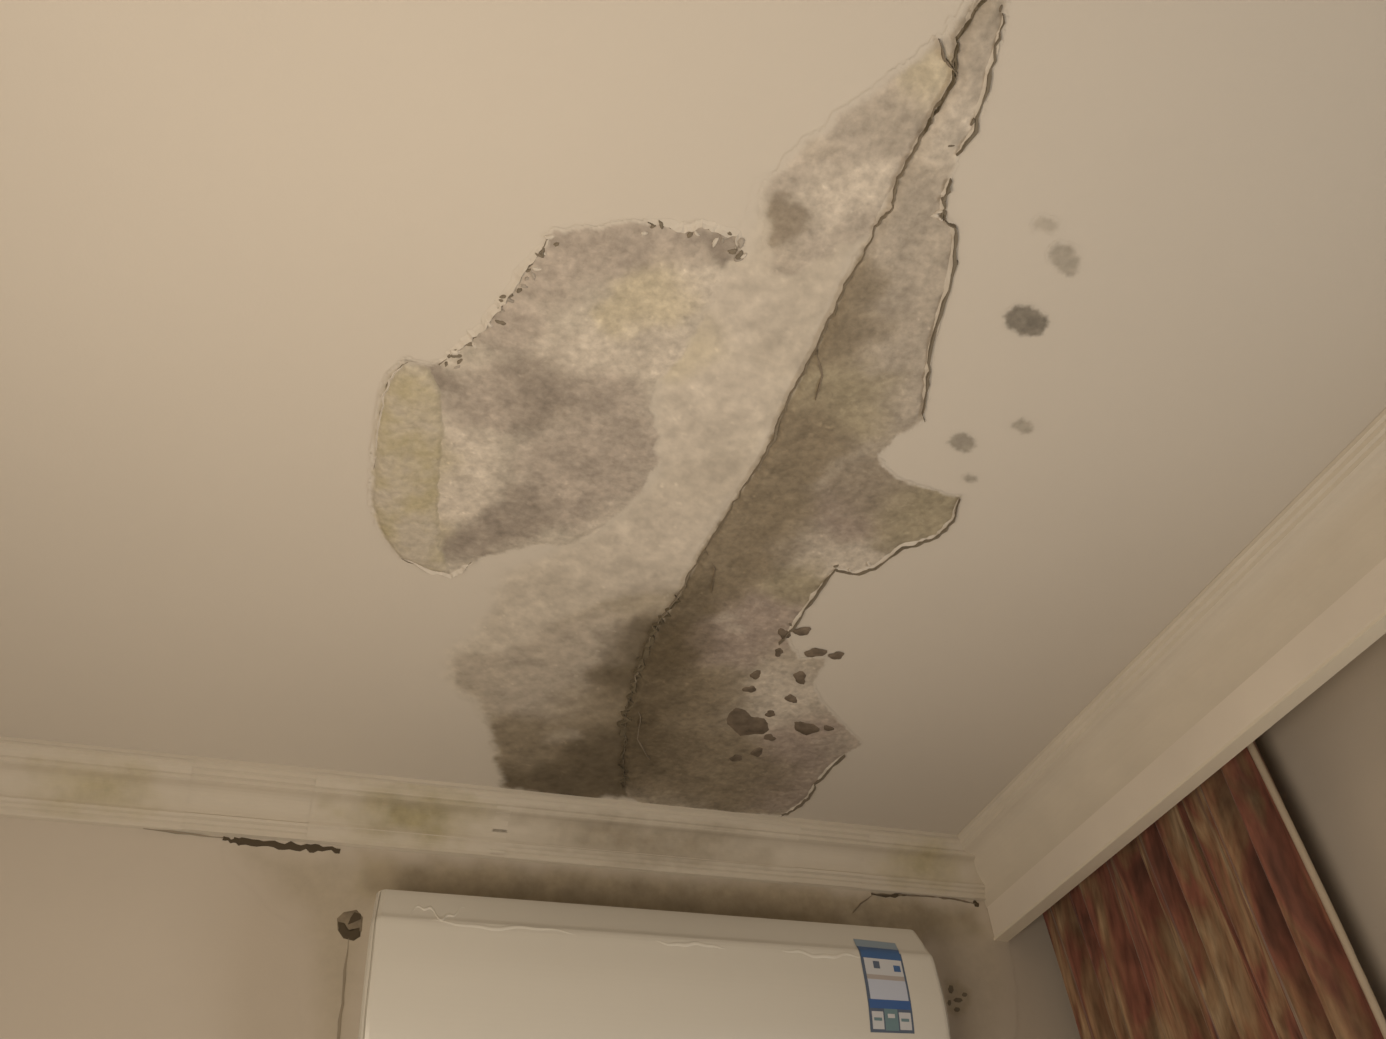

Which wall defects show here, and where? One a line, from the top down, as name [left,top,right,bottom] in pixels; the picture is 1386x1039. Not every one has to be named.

leakage [1028,212,1085,280]
leakage [999,302,1053,339]
peeling [367,0,1011,817]
crack [617,0,987,790]
leakage [1007,416,1037,437]
leakage [221,172,1020,1039]
crack [143,828,341,854]